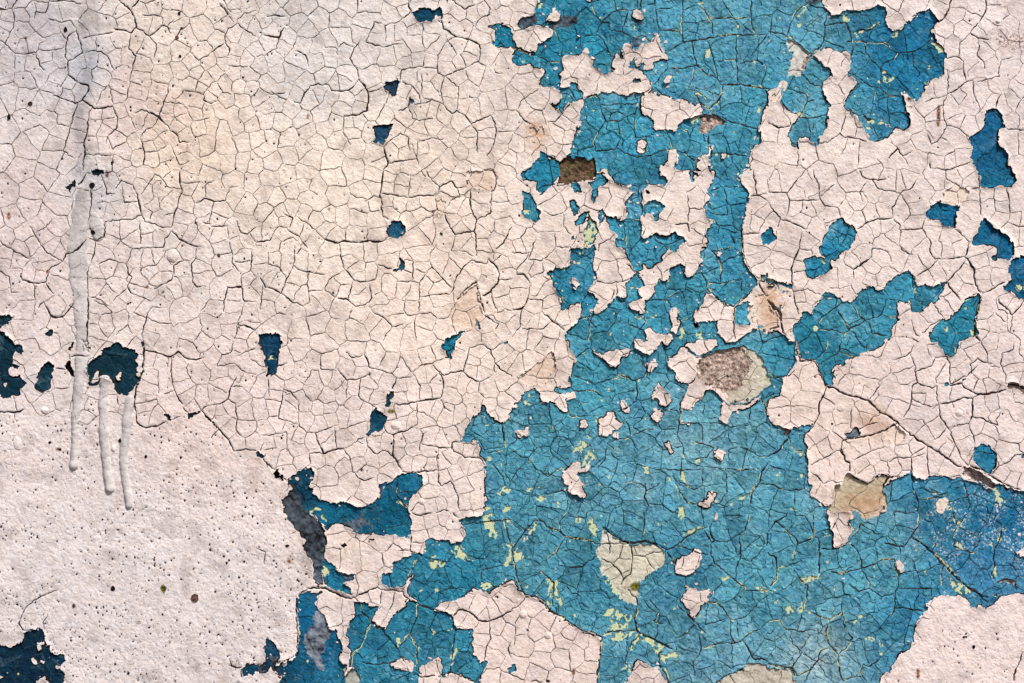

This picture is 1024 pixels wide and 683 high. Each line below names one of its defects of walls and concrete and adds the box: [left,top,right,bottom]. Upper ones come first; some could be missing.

crack [495,0,535,42]
crack [512,29,562,70]
crack [762,116,792,147]
crack [998,234,1024,284]
peeling [0,314,55,399]
peeling [68,341,144,396]
peeling [242,0,1024,683]
crack [0,396,24,418]
crack [313,506,363,572]
crack [418,513,458,544]
crack [0,590,64,683]
peeling [0,627,66,683]